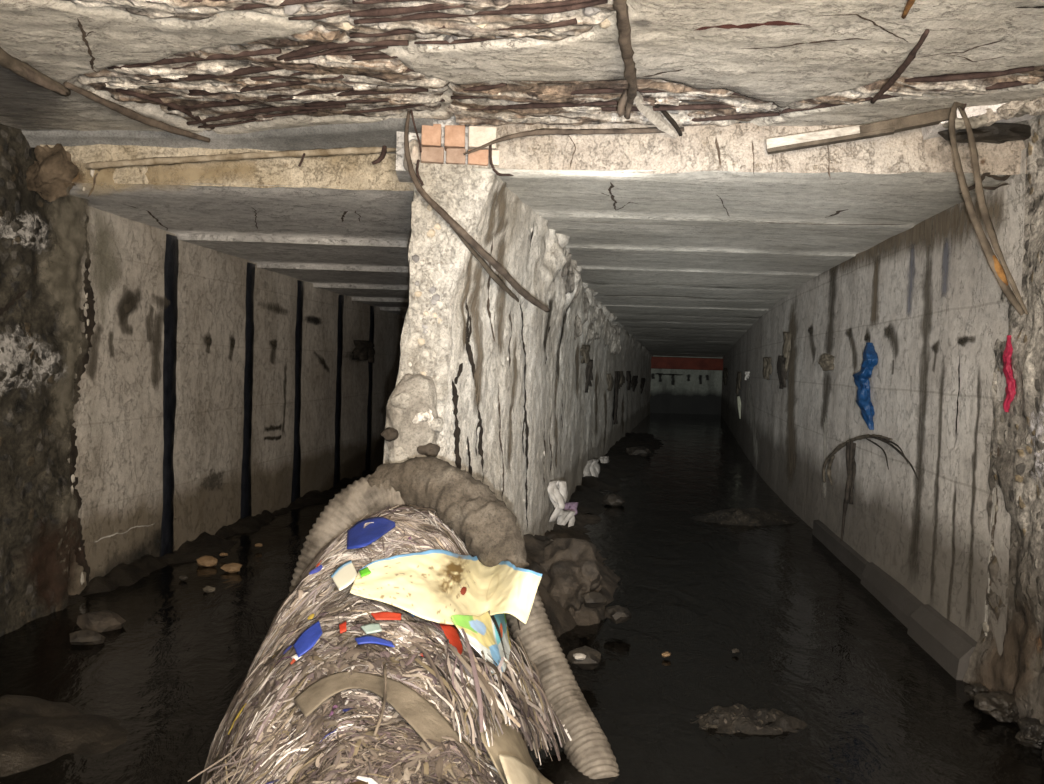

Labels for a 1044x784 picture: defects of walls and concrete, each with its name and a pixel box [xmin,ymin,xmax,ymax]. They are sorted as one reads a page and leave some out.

crack [77,18,100,73]
spalling [60,0,1044,401]
water stain [0,328,68,395]
crack [67,169,100,586]
water stain [87,289,140,377]
water stain [147,298,170,386]
water stain [264,340,287,440]
crack [450,239,563,531]
water stain [688,197,1002,620]
water stain [984,486,997,636]
water stain [977,608,1035,695]